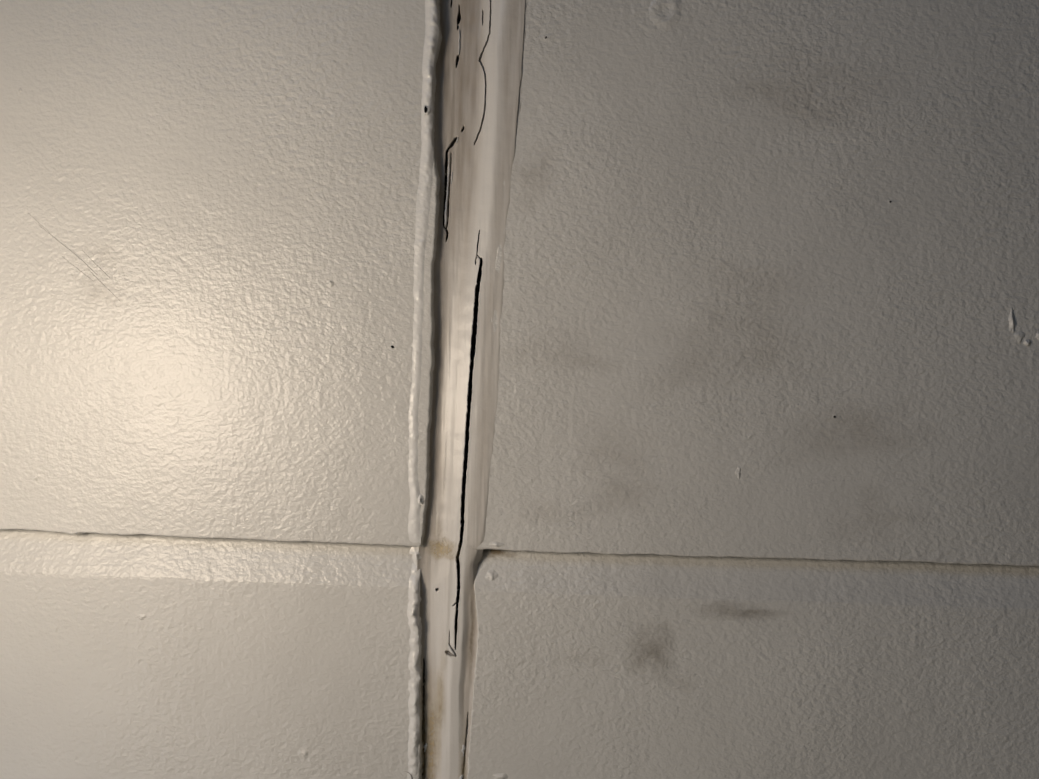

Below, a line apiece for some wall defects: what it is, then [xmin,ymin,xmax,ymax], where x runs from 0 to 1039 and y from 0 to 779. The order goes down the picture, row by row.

crack [443,0,491,241]
crack [454,230,482,649]